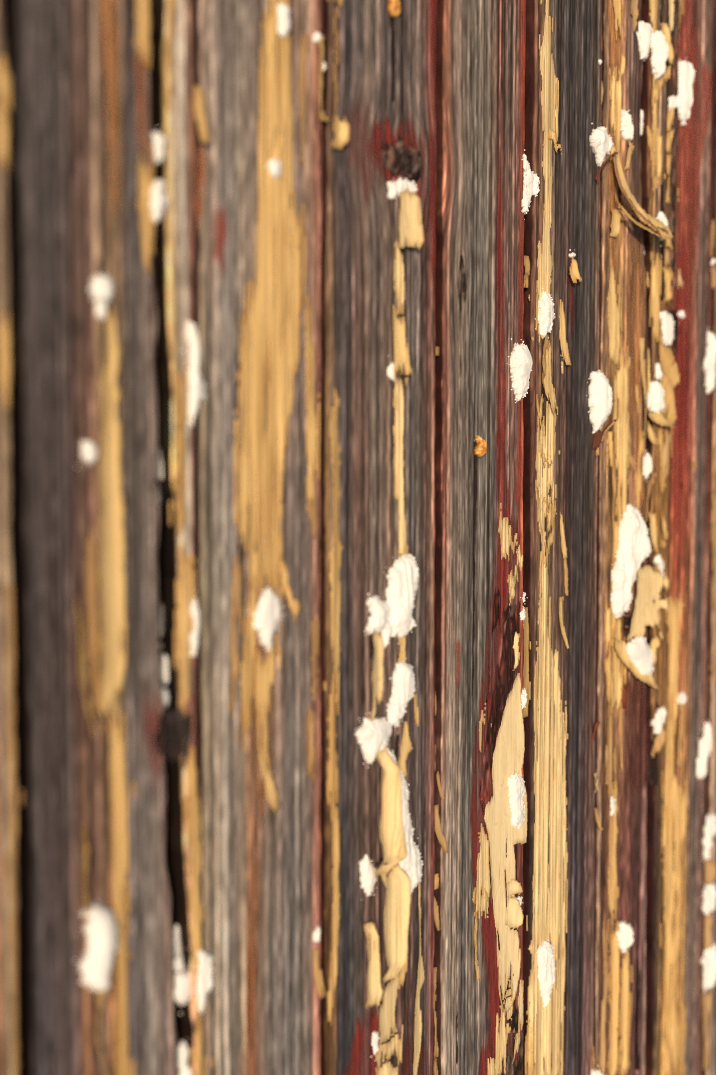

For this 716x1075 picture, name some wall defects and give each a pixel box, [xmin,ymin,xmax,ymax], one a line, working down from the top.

peeling [595,53,634,237]
peeling [613,0,684,203]
peeling [393,188,424,558]
peeling [230,0,350,1025]
peeling [472,0,571,1075]
peeling [369,632,384,721]
peeling [398,635,406,662]
peeling [591,238,688,1075]
peeling [364,693,439,1075]
peeling [434,745,448,854]
peeling [703,992,712,1071]
peeling [704,914,713,951]